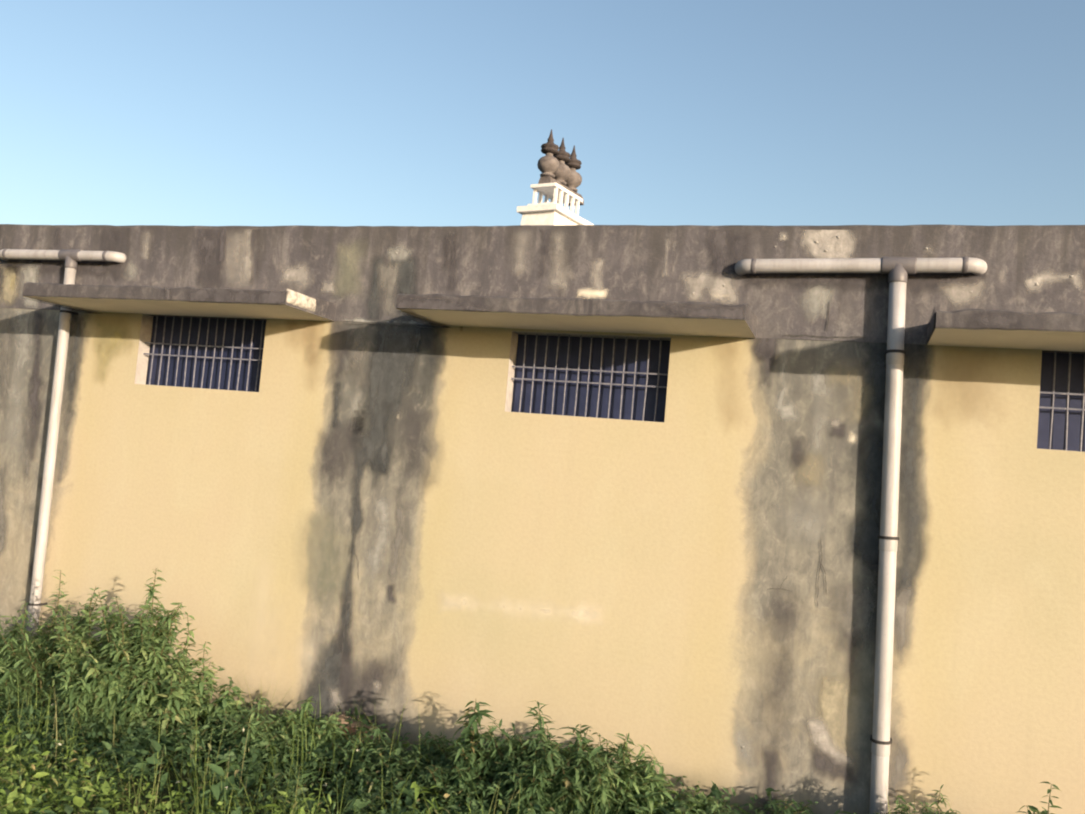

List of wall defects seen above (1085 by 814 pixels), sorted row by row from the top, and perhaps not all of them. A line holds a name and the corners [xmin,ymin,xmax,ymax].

damp [218,229,255,281]
damp [579,260,606,297]
damp [748,273,888,287]
damp [908,273,983,291]
damp [346,259,418,381]
damp [0,312,43,476]
damp [333,384,363,431]
damp [812,374,827,395]
damp [352,431,389,549]
damp [339,567,385,727]
damp [836,564,879,648]
damp [894,588,913,655]